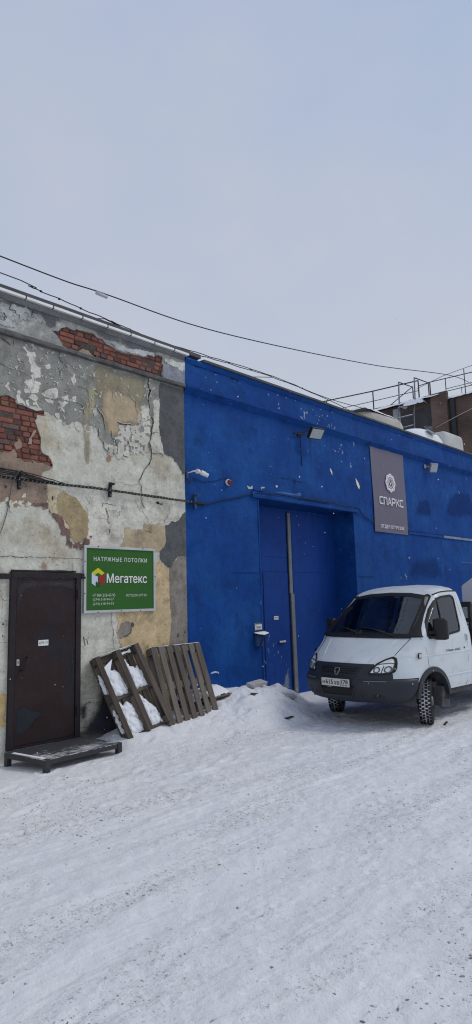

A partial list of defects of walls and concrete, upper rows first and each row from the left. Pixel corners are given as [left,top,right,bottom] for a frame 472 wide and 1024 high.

peeling [0,304,186,702]
crack [59,352,160,532]